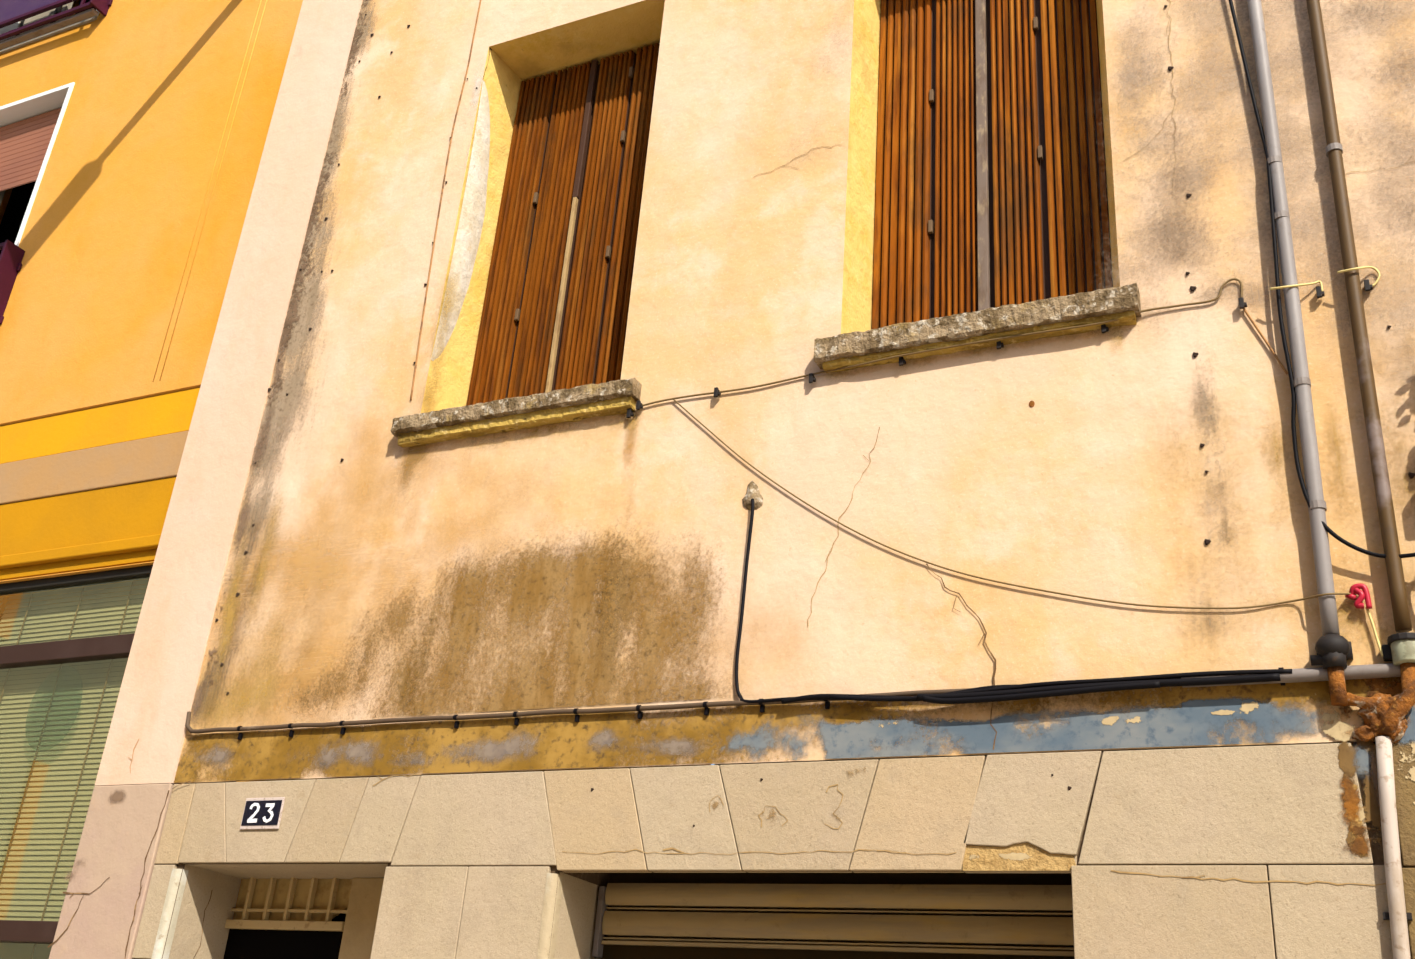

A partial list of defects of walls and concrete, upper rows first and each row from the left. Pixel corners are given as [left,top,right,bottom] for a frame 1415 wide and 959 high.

water stain [275,326,289,384]
water stain [253,409,271,464]
water stain [236,504,249,542]
crack [807,427,880,626]
water stain [174,539,958,782]
crack [926,564,997,749]
peeling [729,698,1382,857]
water stain [976,677,1401,713]
rust [1340,678,1409,744]
peeling [1398,707,1415,781]
rust [1340,777,1370,857]
spalling [963,843,1076,871]